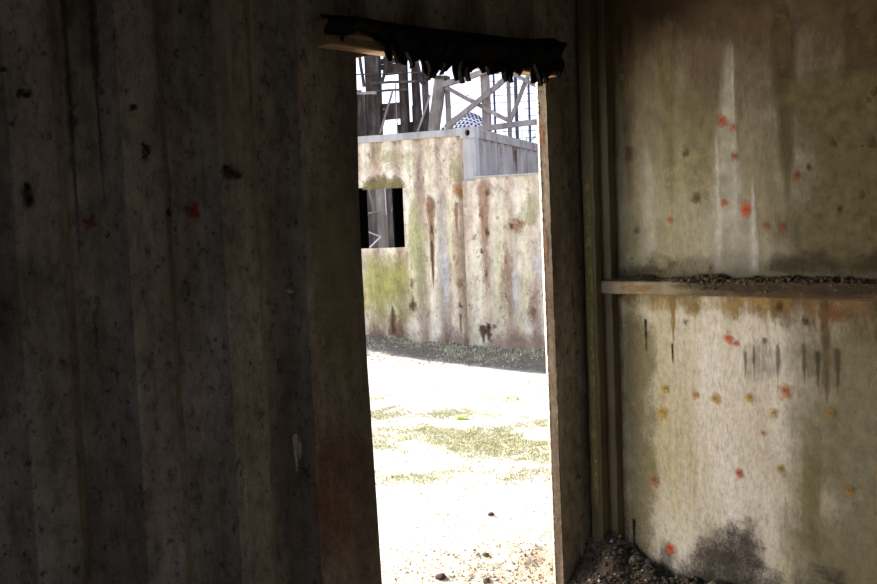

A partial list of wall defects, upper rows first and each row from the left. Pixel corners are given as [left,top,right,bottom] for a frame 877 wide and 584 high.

damp [610,0,877,267]
rust [426,197,435,284]
rust [478,182,490,276]
damp [658,529,778,584]